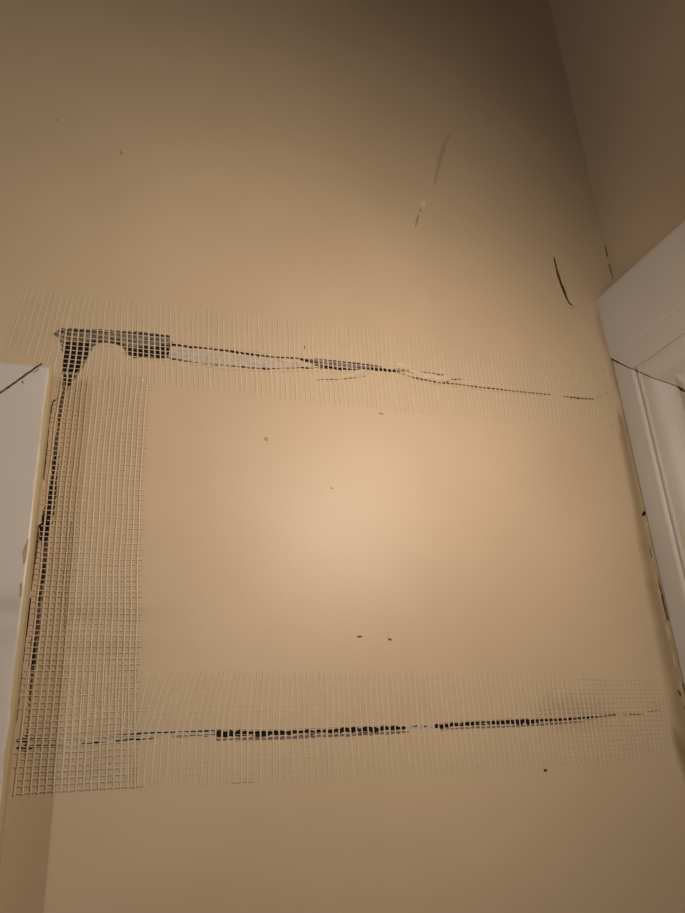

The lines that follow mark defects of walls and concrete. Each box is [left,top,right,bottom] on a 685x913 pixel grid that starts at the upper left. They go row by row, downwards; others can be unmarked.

crack [554,257,573,306]
crack [169,340,614,400]
crack [611,358,685,392]
crack [16,389,658,755]
crack [647,532,685,709]